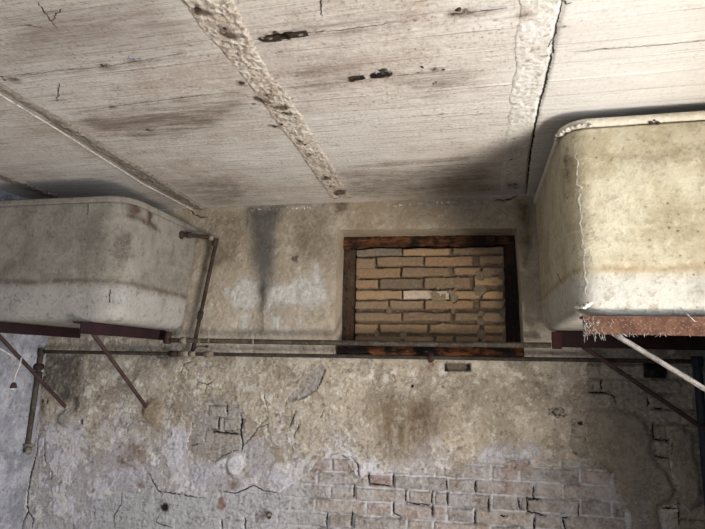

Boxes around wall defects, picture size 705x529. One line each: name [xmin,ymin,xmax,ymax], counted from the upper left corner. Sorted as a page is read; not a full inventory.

crack [25,2,61,28]
crack [494,0,572,202]
damp [251,209,276,300]
crack [22,436,52,528]
crack [214,418,268,461]
crack [224,485,276,494]
flaking render [89,357,705,529]